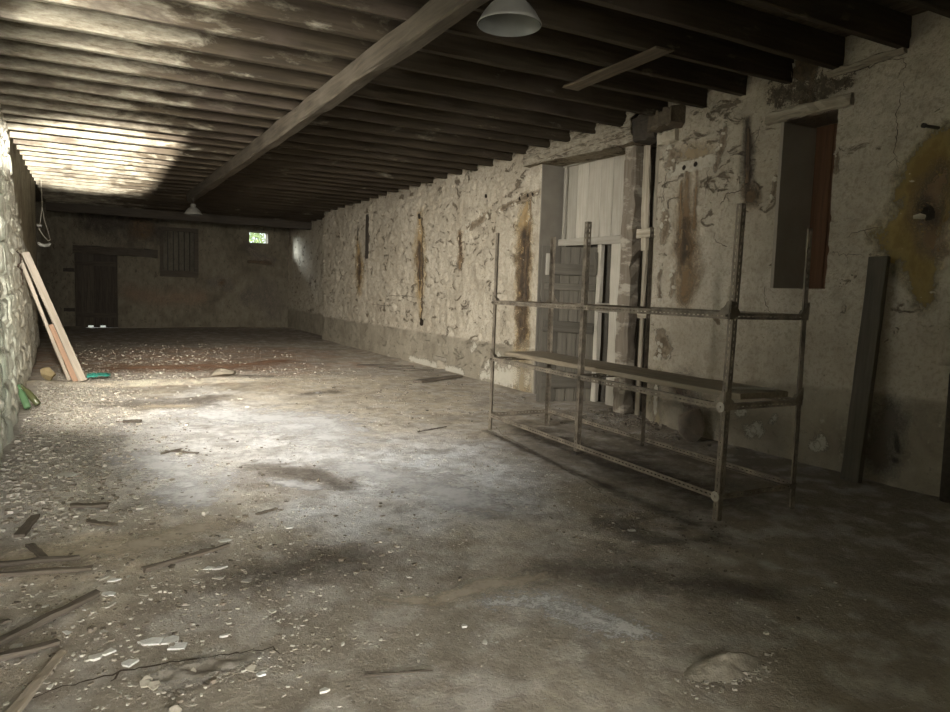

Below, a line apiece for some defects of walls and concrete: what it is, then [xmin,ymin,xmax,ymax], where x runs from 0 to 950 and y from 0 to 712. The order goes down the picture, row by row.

rust [415,212,424,318]
rust [515,197,532,392]
rust [676,171,700,309]
spalling [665,123,727,178]
leakage [869,122,950,309]
crack [33,646,284,698]